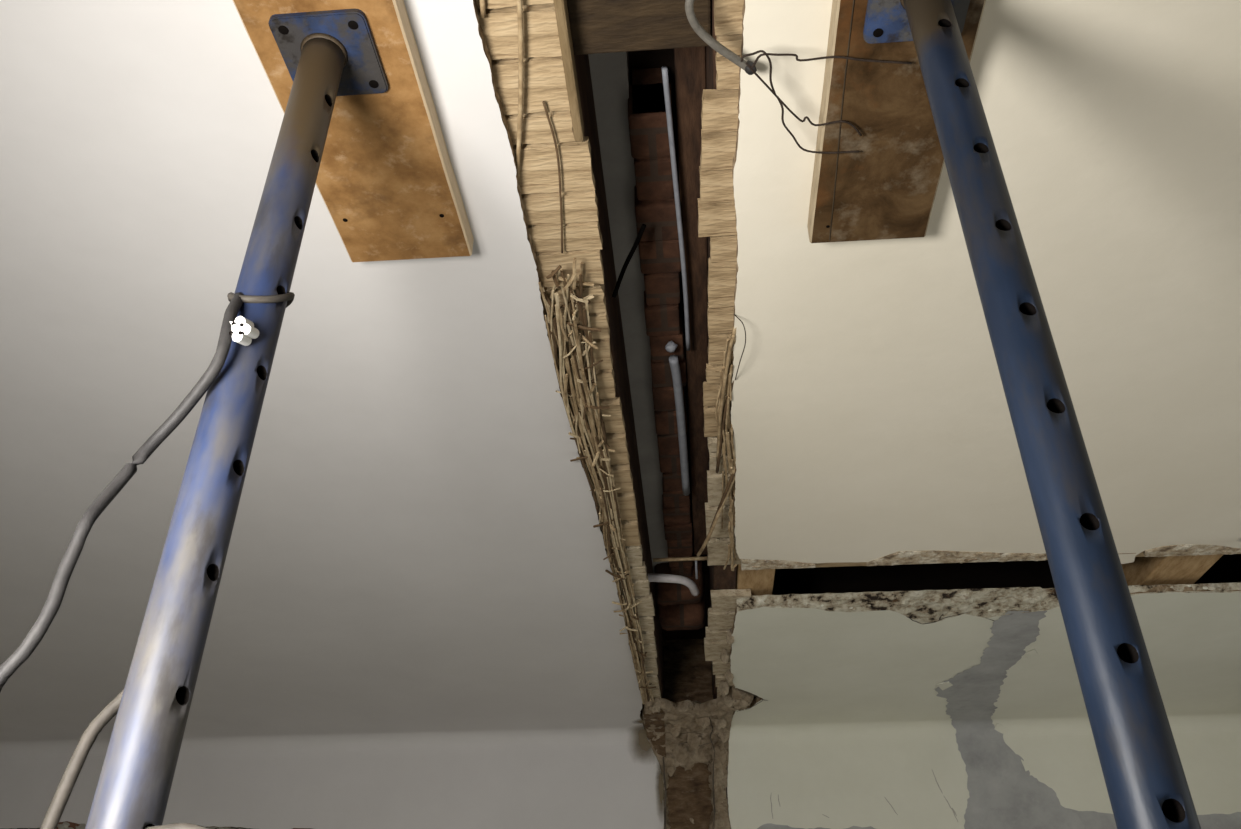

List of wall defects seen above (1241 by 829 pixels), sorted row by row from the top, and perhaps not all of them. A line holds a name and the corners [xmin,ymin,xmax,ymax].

flaking render [741,559,816,570]
flaking render [866,550,1046,566]
flaking render [1118,544,1241,564]
flaking render [1128,582,1241,596]
peeling [736,587,1117,829]
spalling [642,631,754,829]
flaking render [56,821,86,829]
peeling [1197,812,1241,829]